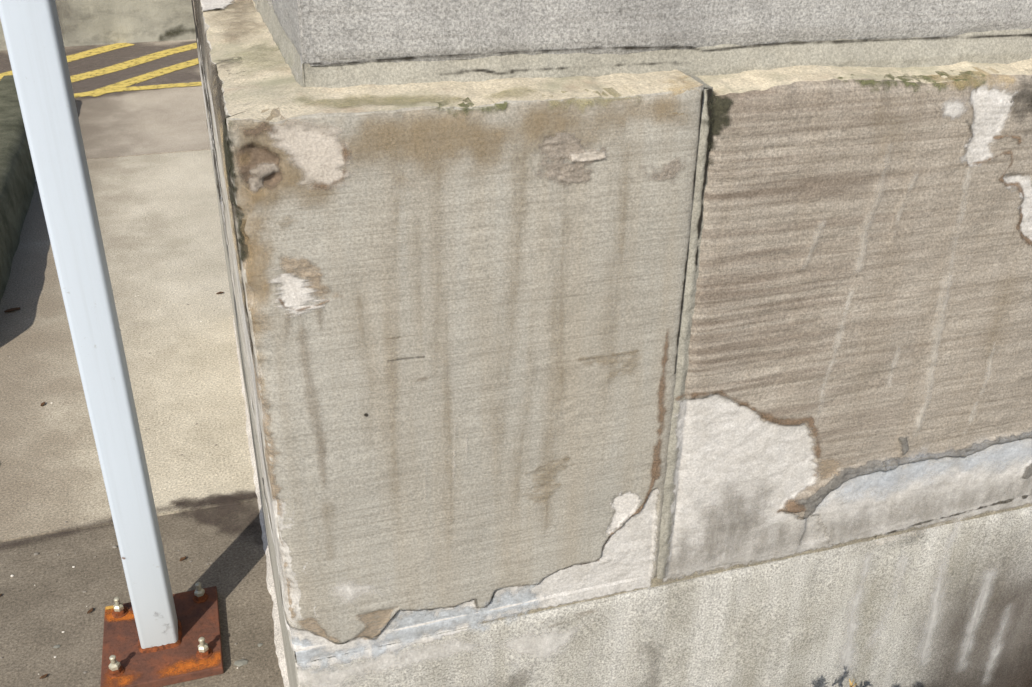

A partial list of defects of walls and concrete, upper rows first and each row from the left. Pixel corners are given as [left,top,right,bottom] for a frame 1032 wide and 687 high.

damp [278,154,316,185]
spalling [197,45,1032,668]